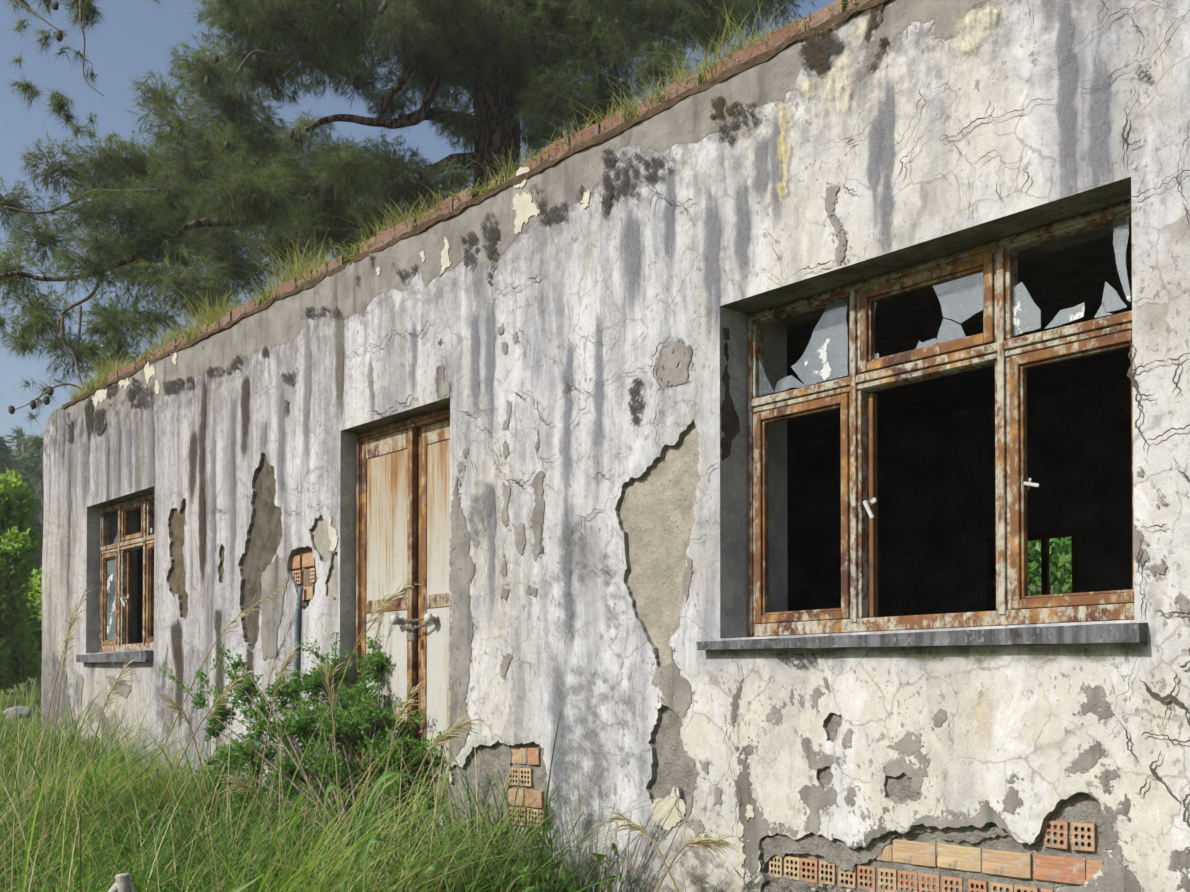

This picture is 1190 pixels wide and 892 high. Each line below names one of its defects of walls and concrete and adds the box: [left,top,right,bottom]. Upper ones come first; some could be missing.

peeling [53,36,804,420]
damp [600,148,675,307]
damp [710,96,790,273]
crack [819,0,1190,243]
flaking render [169,500,189,618]
damp [60,306,343,790]
flaking render [242,454,338,660]
flaking render [446,441,557,890]
damp [553,347,585,643]
damp [628,378,643,426]
flaking render [619,424,1144,892]
crack [1108,524,1190,851]